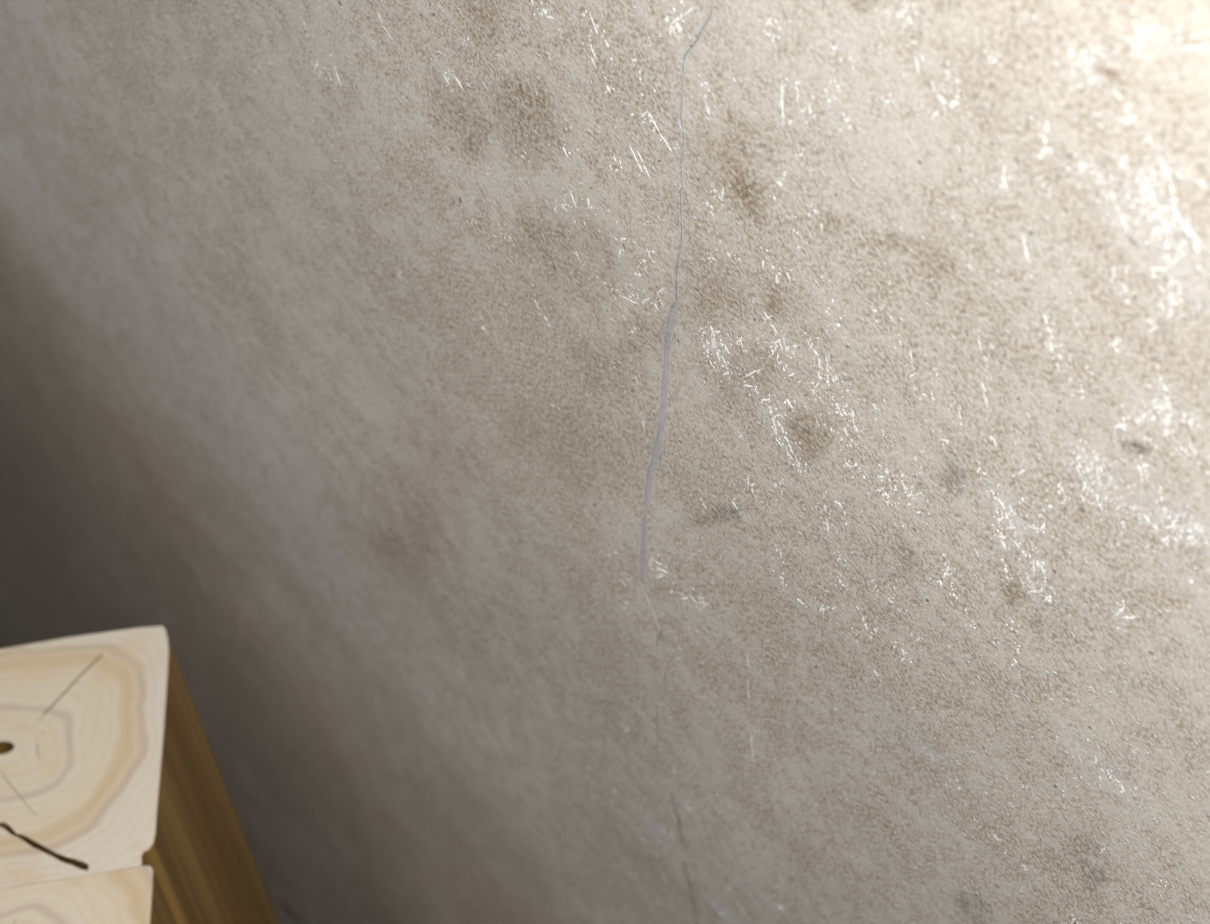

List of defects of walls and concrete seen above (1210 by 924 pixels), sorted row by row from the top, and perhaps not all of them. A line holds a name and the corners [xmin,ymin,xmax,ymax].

crack [640,0,715,646]